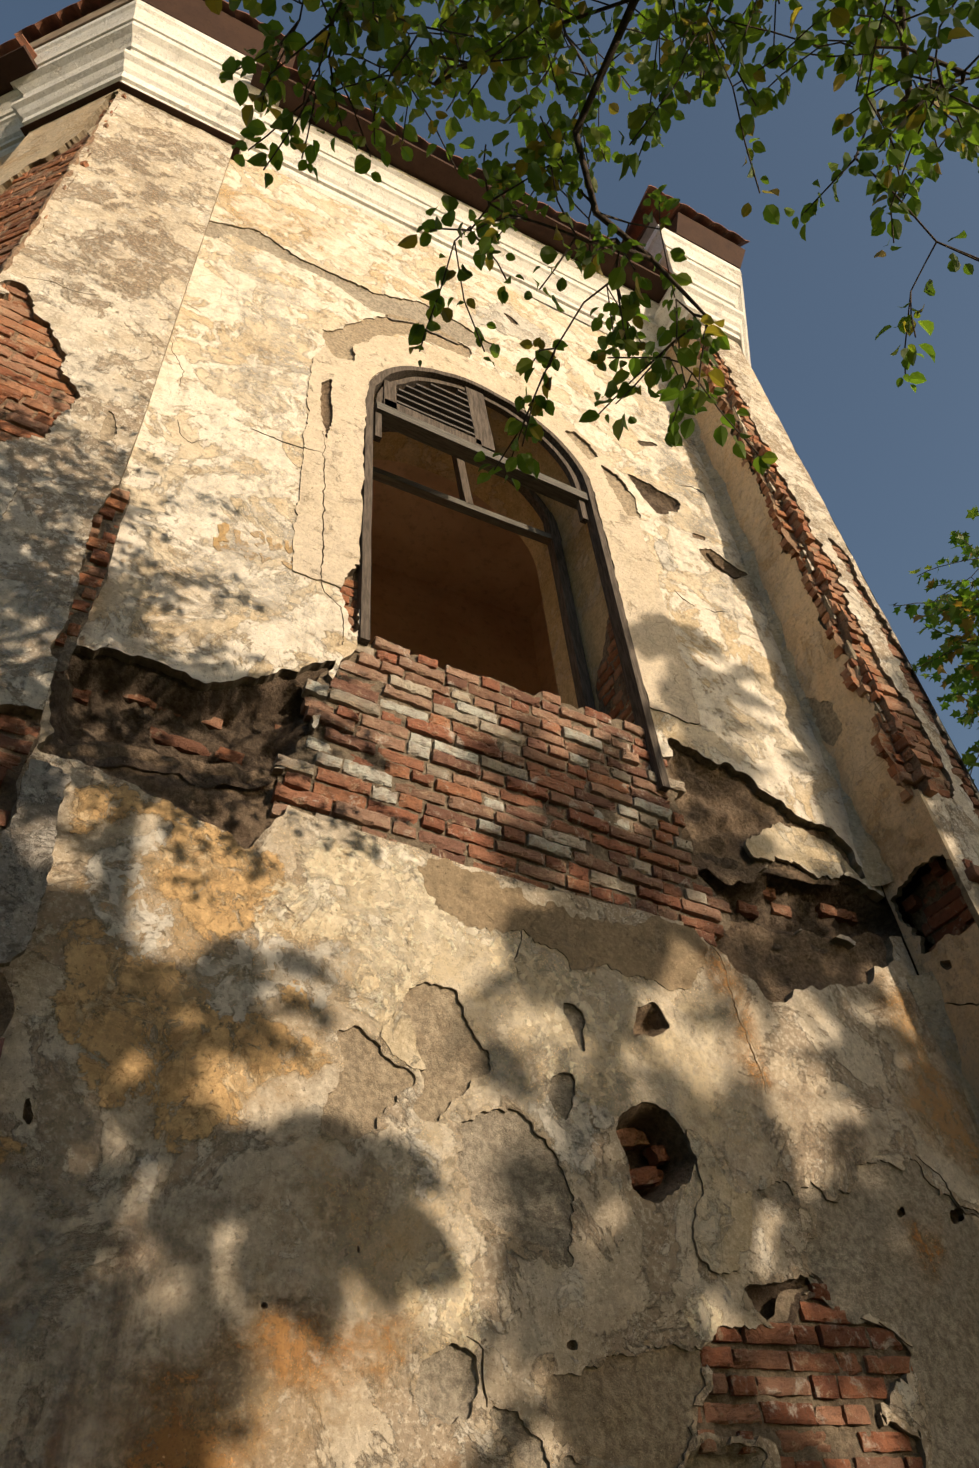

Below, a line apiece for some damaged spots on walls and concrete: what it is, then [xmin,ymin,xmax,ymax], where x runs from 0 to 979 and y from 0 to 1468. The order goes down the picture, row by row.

flaking render [0,93,127,525]
flaking render [697,338,979,819]
spalling [0,488,979,1468]